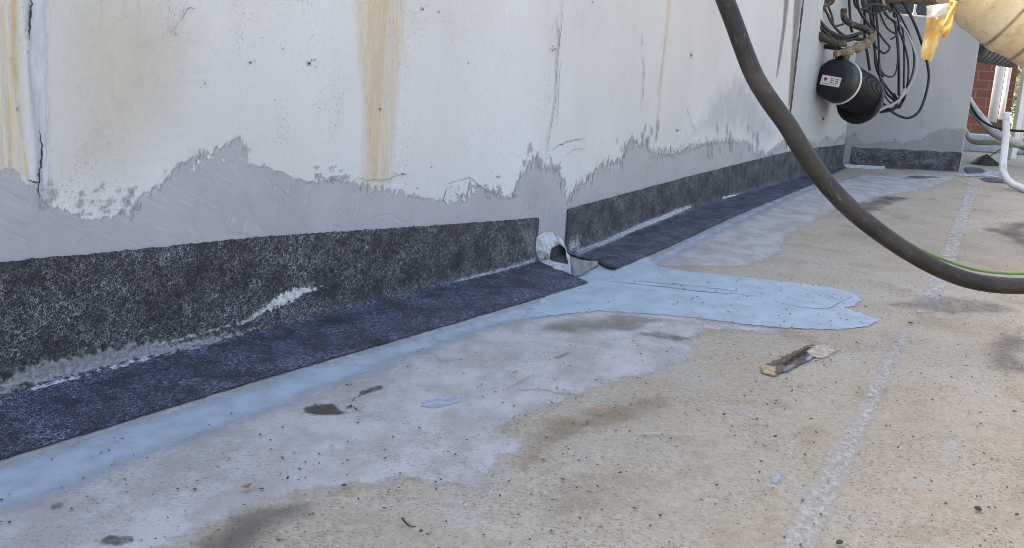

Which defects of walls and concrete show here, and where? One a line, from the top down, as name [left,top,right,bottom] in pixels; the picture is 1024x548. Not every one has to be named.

crack [26,0,34,41]
crack [546,1,581,164]
crack [28,131,44,201]